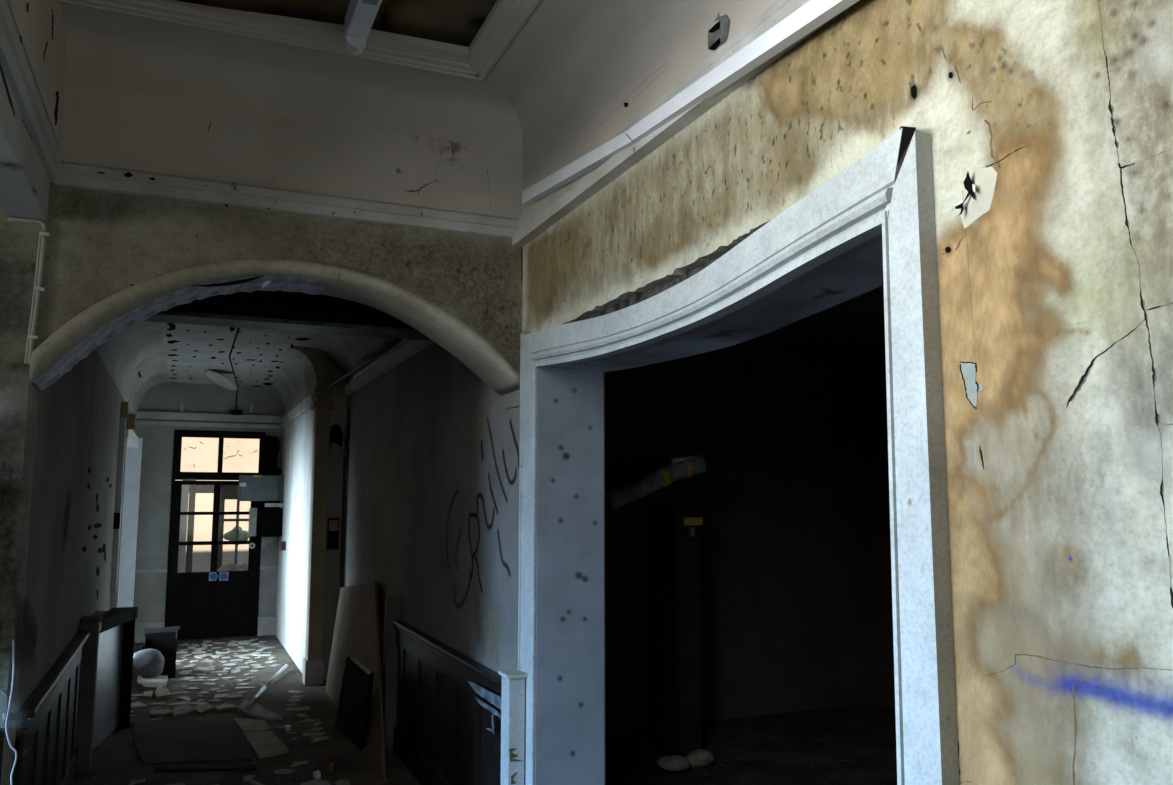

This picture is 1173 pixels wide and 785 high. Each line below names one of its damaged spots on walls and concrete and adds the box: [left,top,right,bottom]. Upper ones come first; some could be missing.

spalling [955,172,975,216]
flaking render [585,249,731,320]
crack [1066,0,1173,608]
water stain [528,0,1142,785]
peeling [960,361,984,409]
water stain [0,436,36,662]
crack [981,654,1173,785]